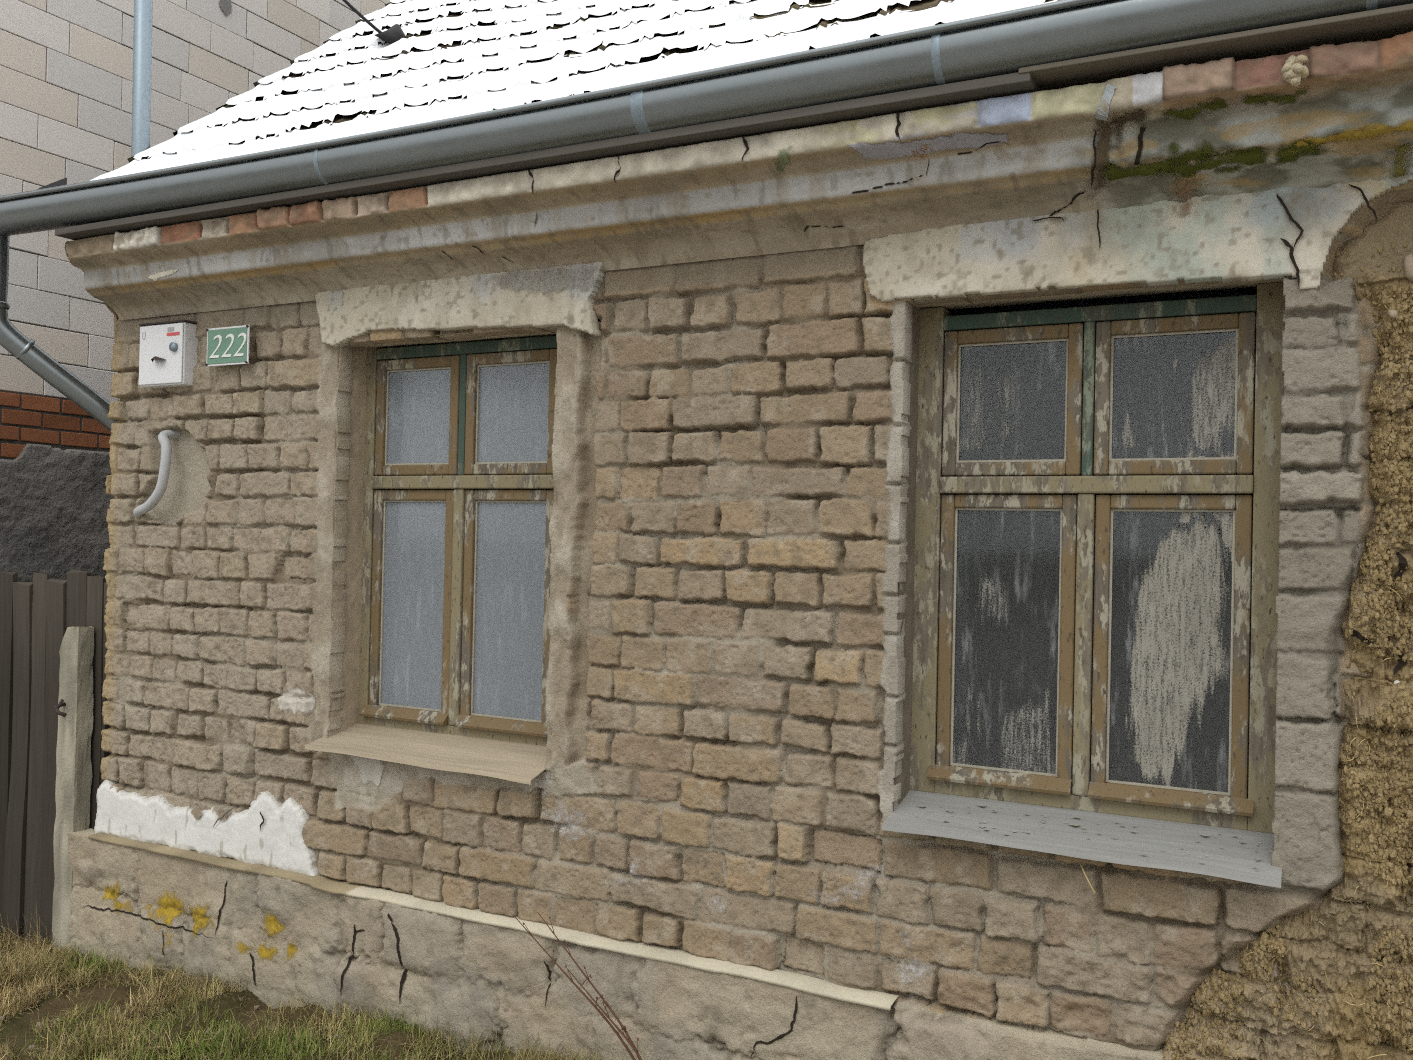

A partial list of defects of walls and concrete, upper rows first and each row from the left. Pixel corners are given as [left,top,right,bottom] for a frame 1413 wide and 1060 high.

crack [1032,84,1146,249]
damp [1092,110,1146,188]
crack [1276,193,1304,286]
crack [1349,184,1377,221]
spalling [1161,200,1413,1060]